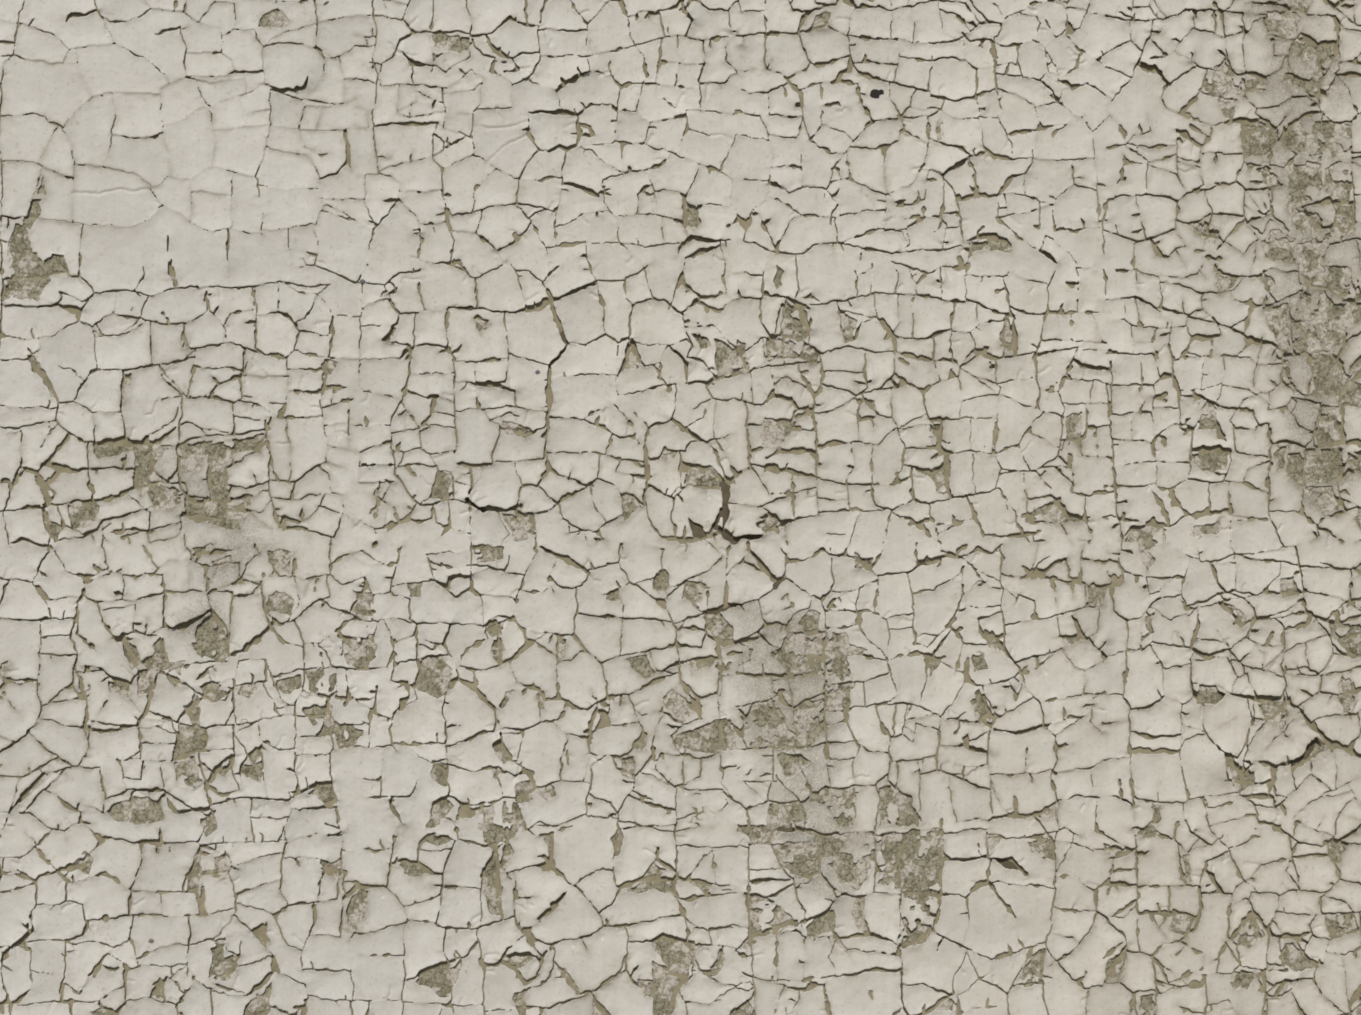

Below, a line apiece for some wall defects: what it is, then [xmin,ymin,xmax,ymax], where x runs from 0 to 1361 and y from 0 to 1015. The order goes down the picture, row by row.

crack [0,1,88,133]
peeling [0,161,93,307]
crack [66,0,264,122]
crack [266,76,344,147]
crack [635,110,770,229]
crack [1014,189,1085,264]
crack [1036,4,1106,96]
peeling [1068,0,1361,528]
crack [293,307,380,435]
crack [461,371,527,422]
crack [1112,767,1234,823]
crack [0,783,281,1015]